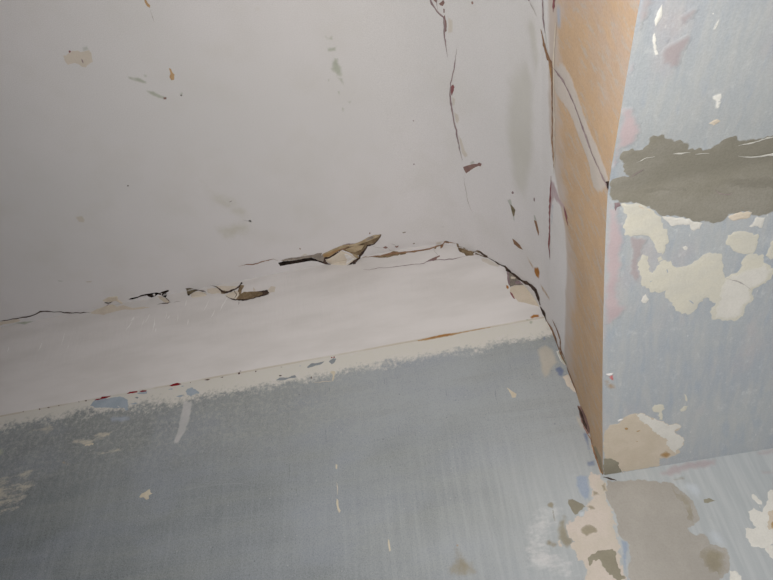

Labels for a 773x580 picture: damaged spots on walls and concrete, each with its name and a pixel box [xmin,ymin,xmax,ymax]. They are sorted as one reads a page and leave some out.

crack [430,0,468,158]
crack [528,0,607,258]
crack [0,296,149,326]
flaking render [242,234,381,266]
peeling [536,336,576,393]
peeling [614,202,773,322]
peeling [514,404,685,580]
peeling [745,489,773,559]